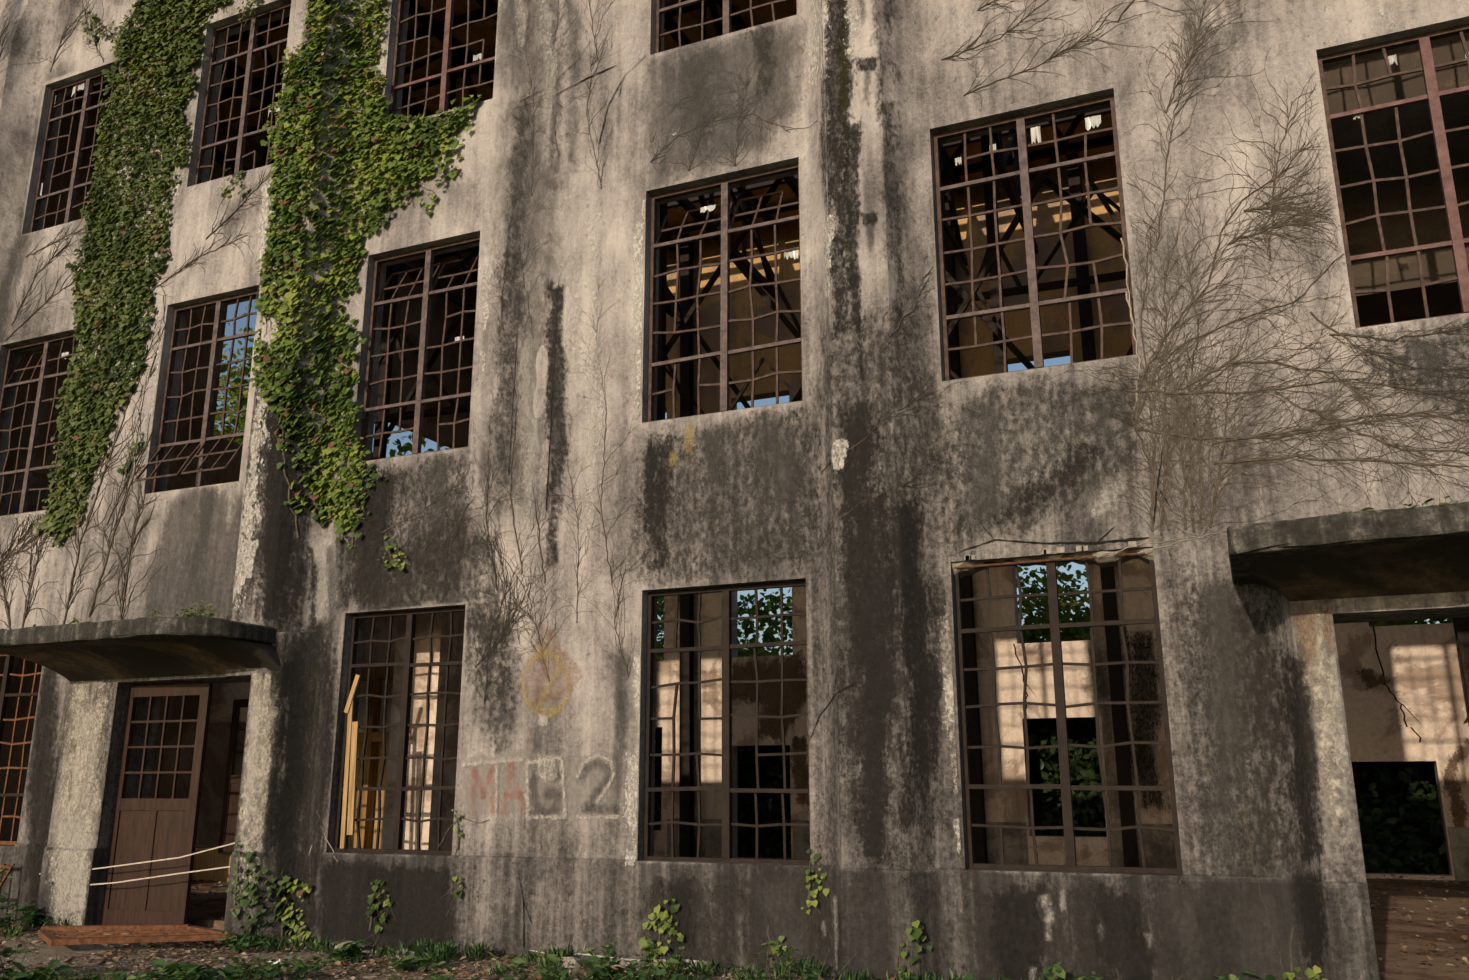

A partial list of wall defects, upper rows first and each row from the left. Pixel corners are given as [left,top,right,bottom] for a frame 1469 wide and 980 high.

water stain [144,367,519,948]
water stain [487,0,579,565]
water stain [639,869,850,976]
water stain [632,0,1138,897]
water stain [1354,320,1469,414]